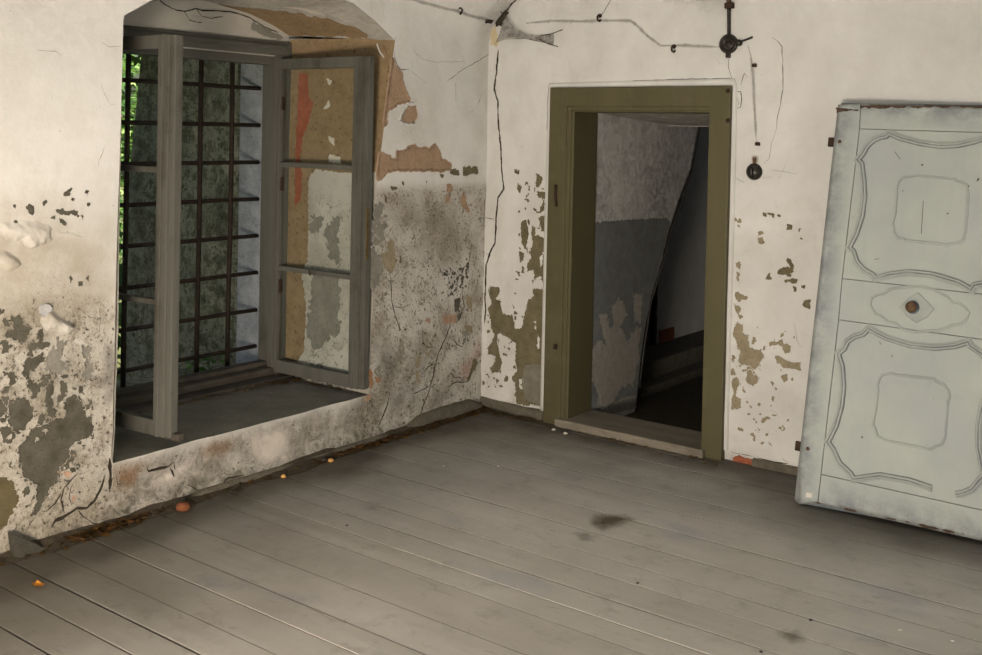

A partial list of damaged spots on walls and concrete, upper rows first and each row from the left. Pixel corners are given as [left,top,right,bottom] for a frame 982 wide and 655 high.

crack [160,0,278,33]
peeling [13,188,91,226]
spalling [218,4,545,407]
crack [377,43,506,427]
peeling [39,303,53,316]
peeling [765,258,811,309]
peeling [730,262,803,446]
peeling [0,309,97,531]
crack [25,458,243,533]